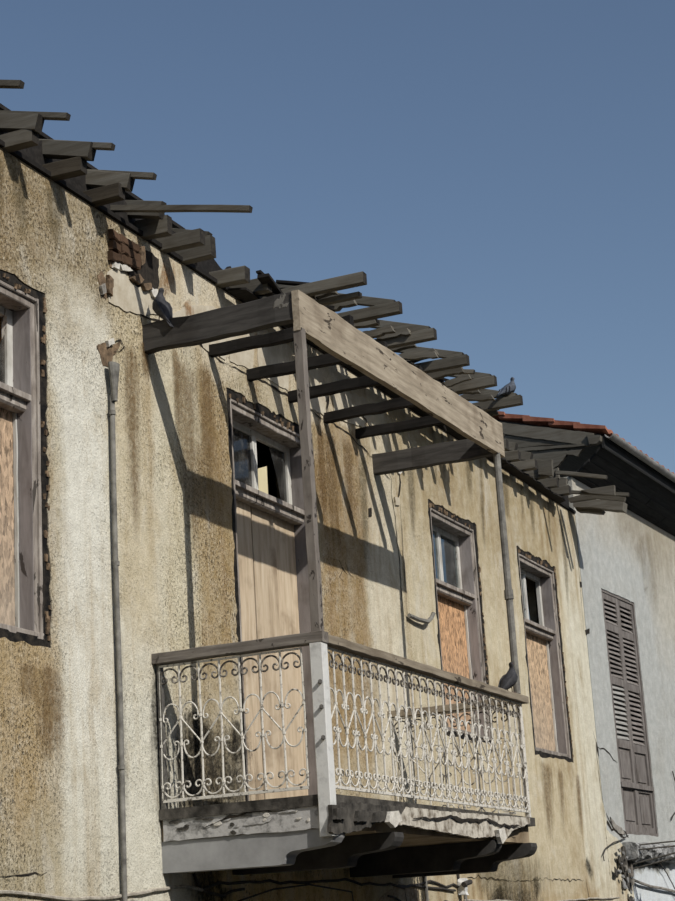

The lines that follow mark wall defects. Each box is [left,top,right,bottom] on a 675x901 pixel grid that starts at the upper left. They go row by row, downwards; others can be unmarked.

flaking render [97,229,160,316]
water stain [127,348,148,485]
water stain [174,353,213,488]
crack [0,870,48,878]
water stain [486,864,539,901]